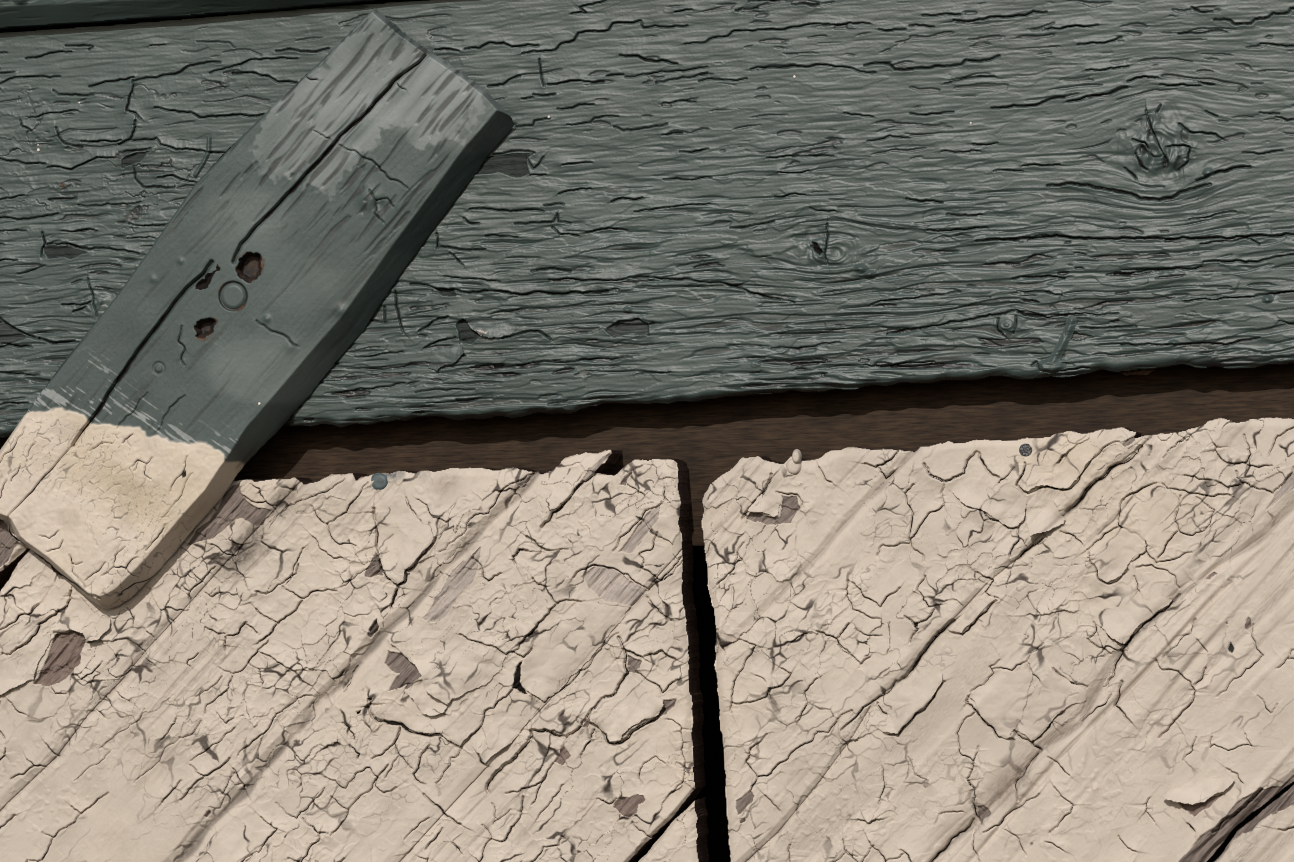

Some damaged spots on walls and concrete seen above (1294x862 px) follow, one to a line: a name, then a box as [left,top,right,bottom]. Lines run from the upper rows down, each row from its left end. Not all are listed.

crack [355,0,1294,403]
crack [0,41,685,862]
peeling [0,597,111,695]
peeling [357,547,628,765]
peeling [627,655,642,672]
crack [721,427,1294,862]
peeling [1163,774,1294,862]